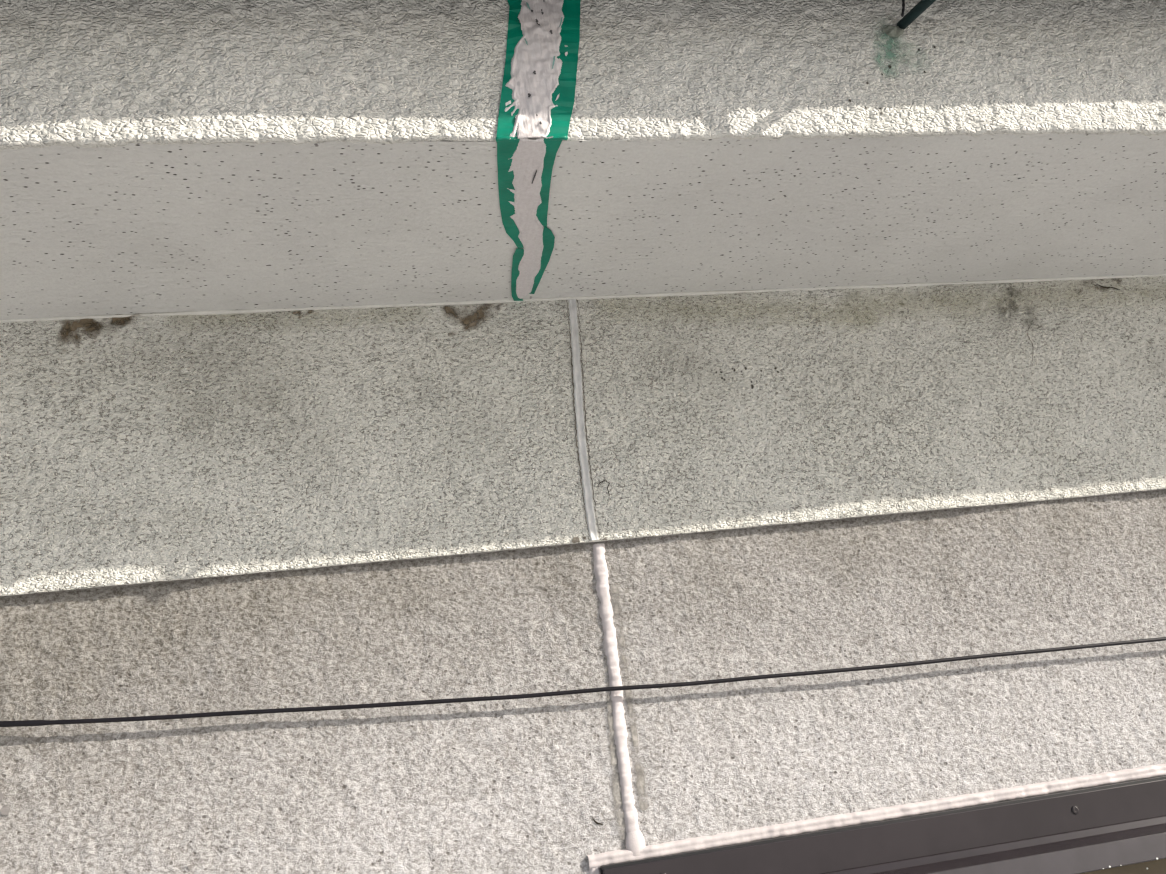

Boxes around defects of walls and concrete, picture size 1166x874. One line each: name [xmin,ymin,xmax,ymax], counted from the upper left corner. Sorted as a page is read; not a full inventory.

rust [62,314,134,341]